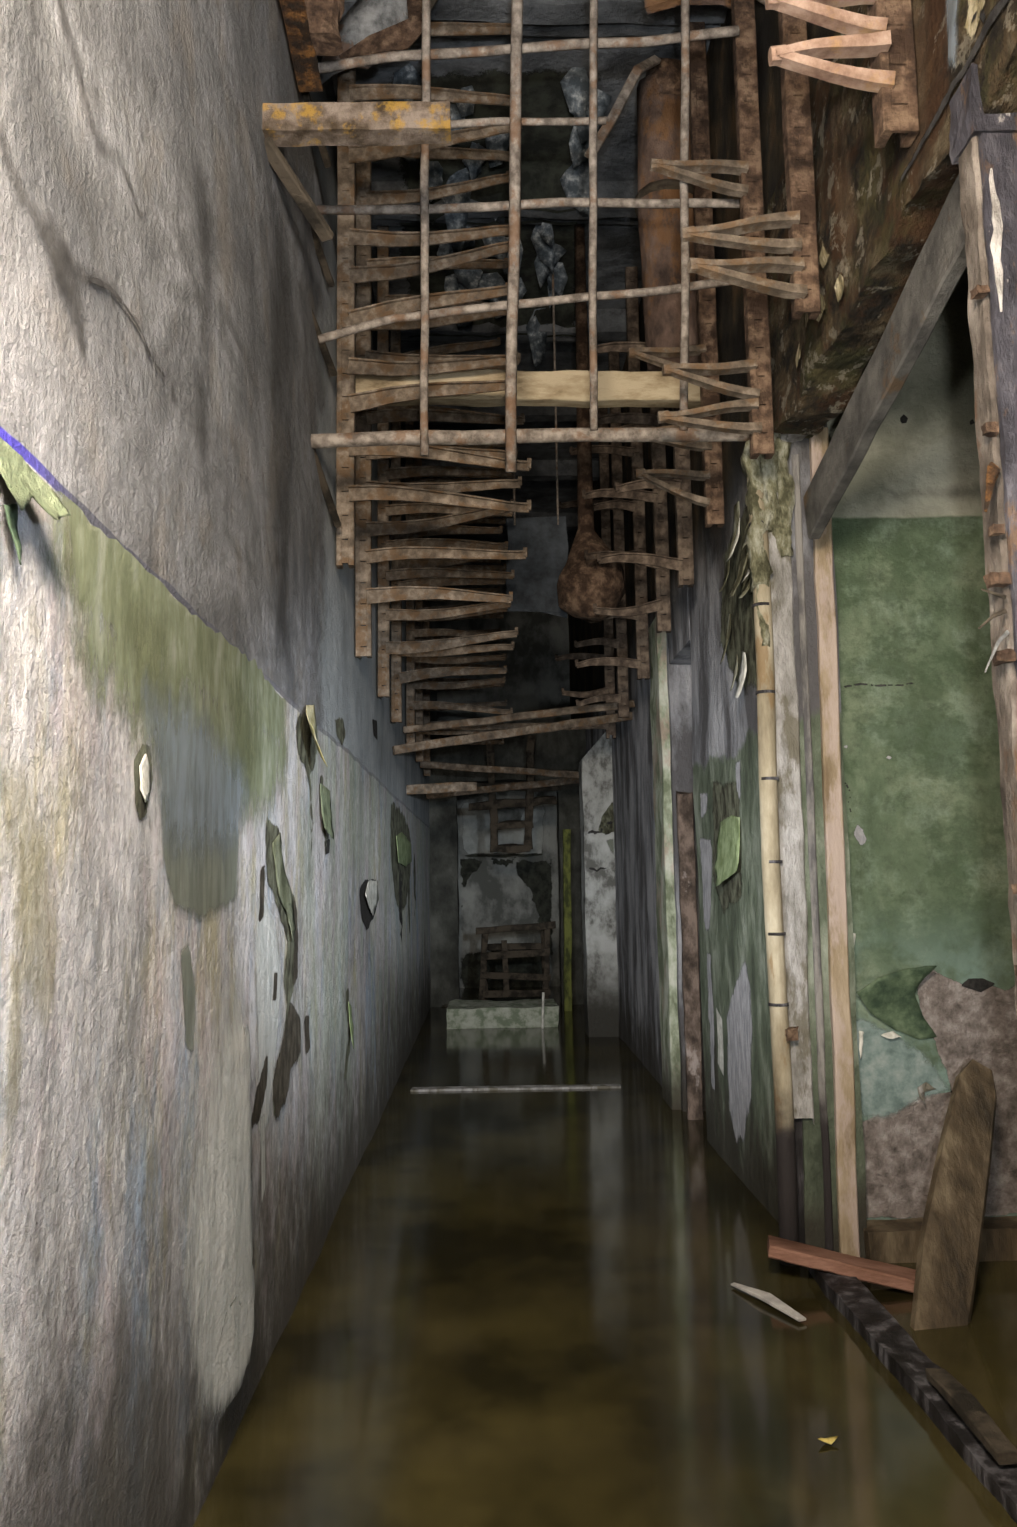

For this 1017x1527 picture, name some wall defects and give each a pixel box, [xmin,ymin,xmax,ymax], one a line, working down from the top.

crack [60,0,94,130]
crack [0,128,24,199]
crack [126,175,143,215]
crack [43,228,177,401]
peeling [0,437,71,565]
water stain [136,623,258,918]
peeling [296,705,334,855]
spalling [335,718,345,745]
peeling [359,802,416,941]
water stain [181,946,195,1050]
peeling [252,817,310,1128]
peeling [857,966,1017,1219]